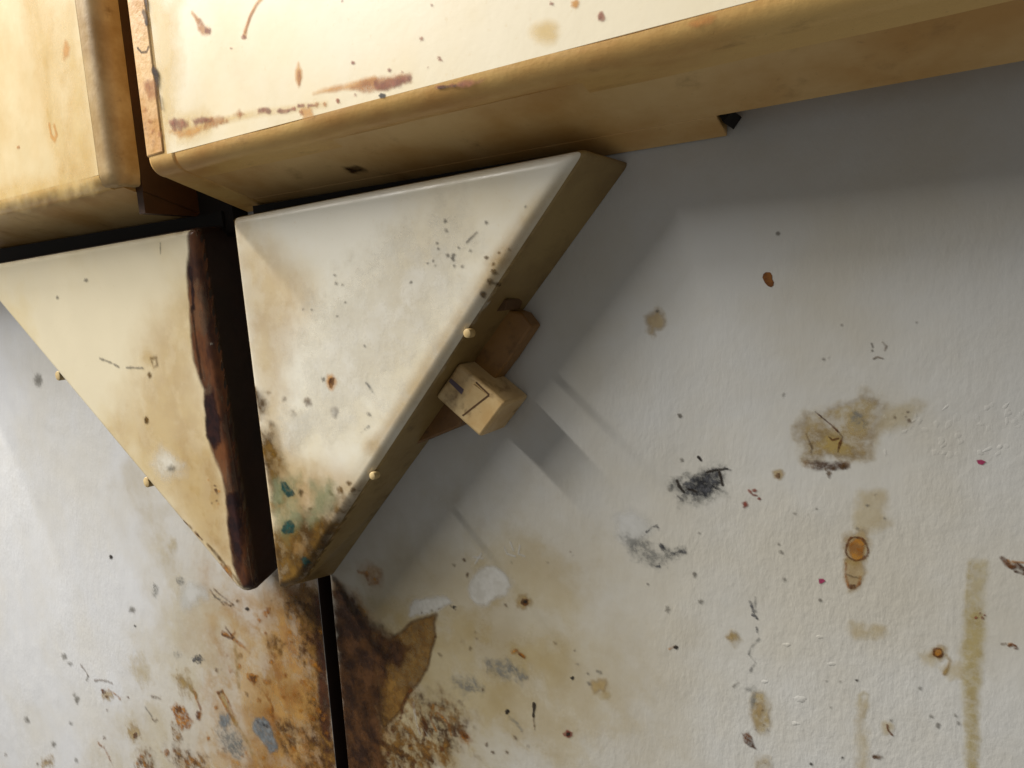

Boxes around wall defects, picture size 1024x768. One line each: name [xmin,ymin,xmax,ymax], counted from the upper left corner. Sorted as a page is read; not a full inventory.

leakage [805,404,872,476]
rust [845,537,869,561]